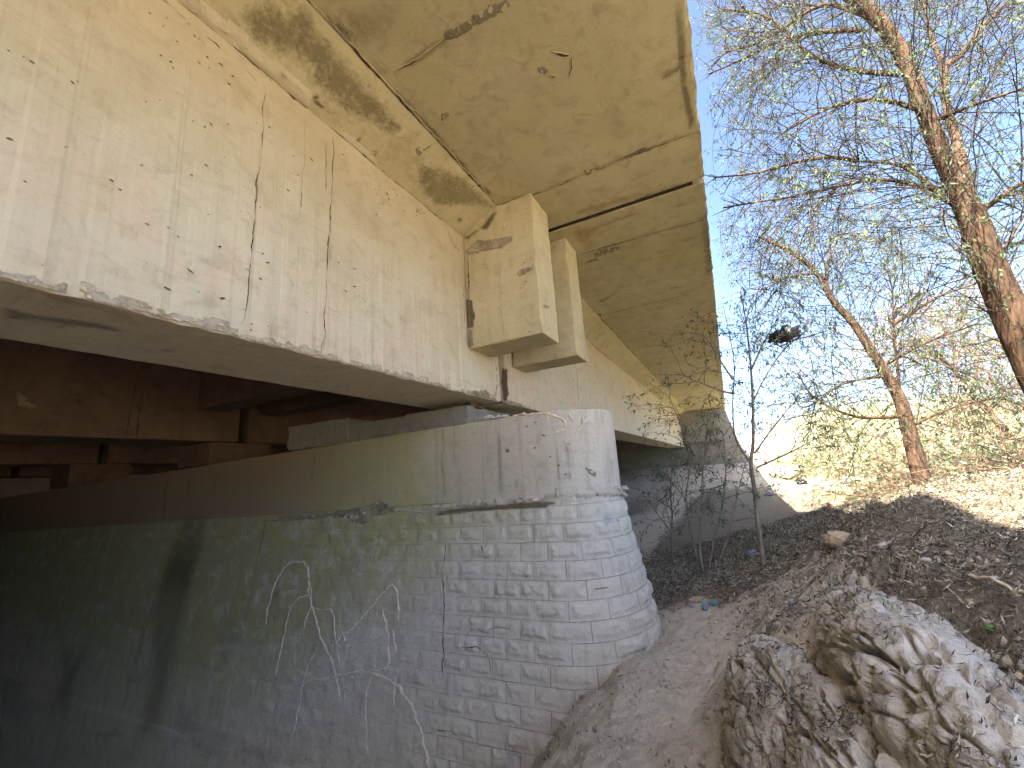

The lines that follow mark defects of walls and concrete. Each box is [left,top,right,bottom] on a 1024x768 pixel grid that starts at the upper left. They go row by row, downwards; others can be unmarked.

spalling [444,0,510,40]
crack [162,0,498,352]
spalling [466,236,519,269]
spalling [0,270,530,409]
spalling [278,500,395,524]
crack [441,544,512,677]